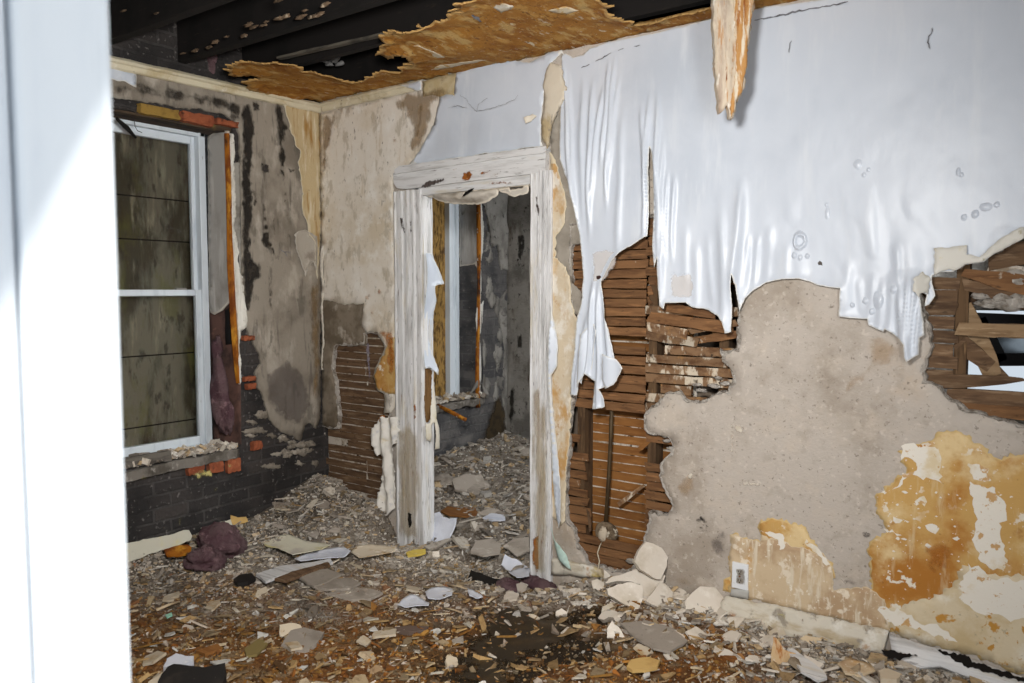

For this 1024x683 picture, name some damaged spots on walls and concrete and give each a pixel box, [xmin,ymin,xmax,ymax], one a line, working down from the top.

damp [111,74,370,469]
peeling [283,73,456,501]
spalling [541,62,743,573]
spalling [920,227,1024,429]
peeling [723,430,1024,675]